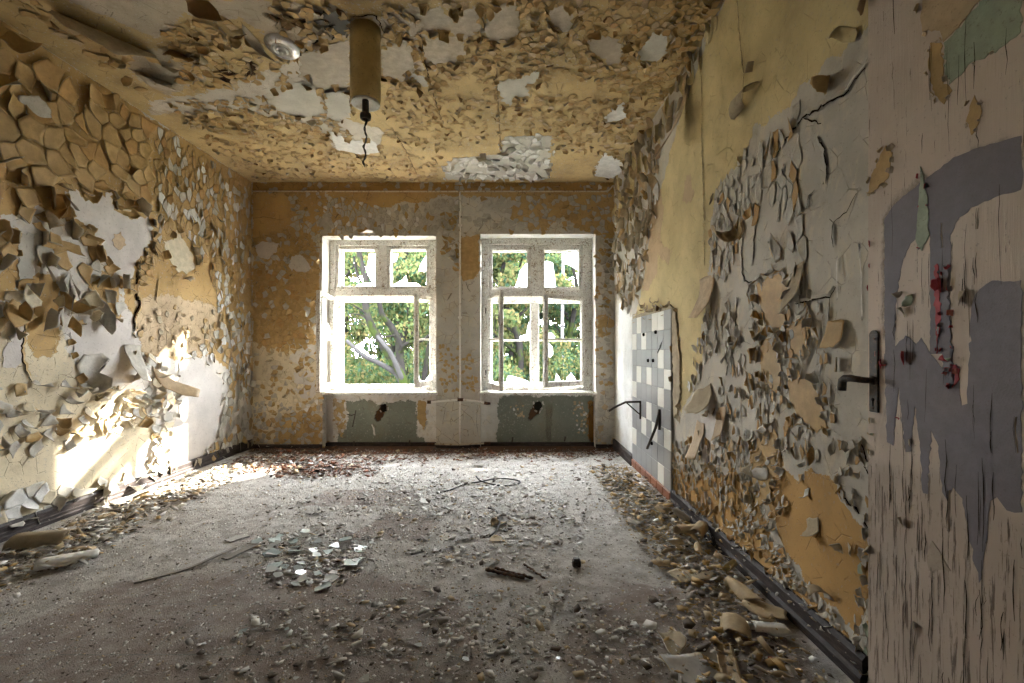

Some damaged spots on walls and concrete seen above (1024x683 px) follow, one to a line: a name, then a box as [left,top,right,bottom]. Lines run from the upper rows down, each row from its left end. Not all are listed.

peeling [913,0,1023,104]
peeling [964,95,983,135]
crack [733,64,865,353]
peeling [866,143,895,196]
peeling [915,167,930,251]
peeling [0,0,874,634]
peeling [892,291,913,318]
peeling [930,264,965,389]
peeling [852,614,868,656]